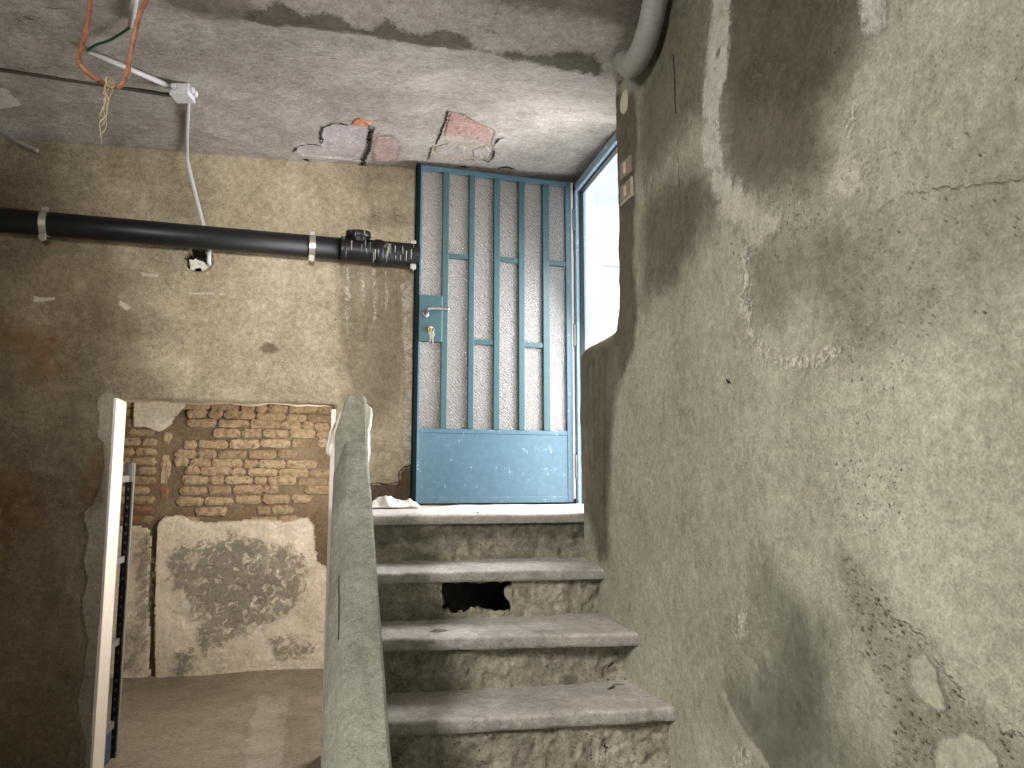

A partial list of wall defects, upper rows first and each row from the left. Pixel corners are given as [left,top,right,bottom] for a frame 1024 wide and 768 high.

spalling [292,118,400,166]
spalling [428,111,514,169]
crack [877,177,1024,212]
damp [373,0,860,560]
damp [344,267,413,459]
damp [123,533,306,676]
damp [267,636,314,660]